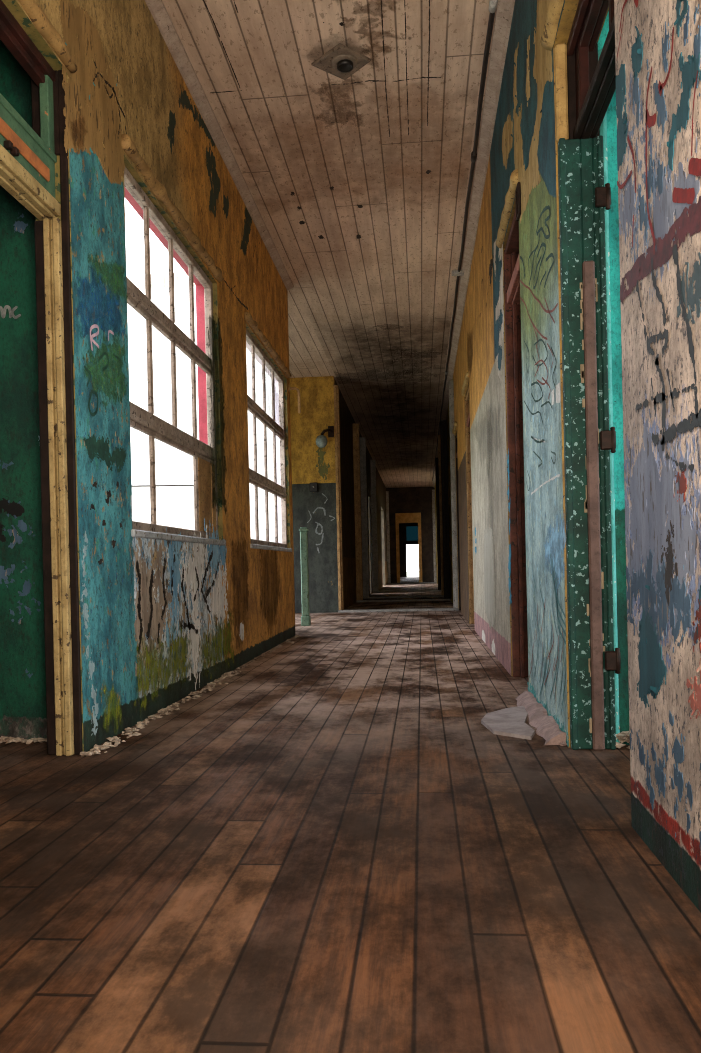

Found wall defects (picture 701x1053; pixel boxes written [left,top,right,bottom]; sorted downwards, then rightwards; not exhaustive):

peeling [616,0,701,251]
peeling [676,251,701,324]
damp [341,328,448,466]
peeling [0,561,41,624]
spalling [80,531,103,736]
peeling [129,519,244,690]
peeling [625,406,701,719]
spalling [630,710,701,851]